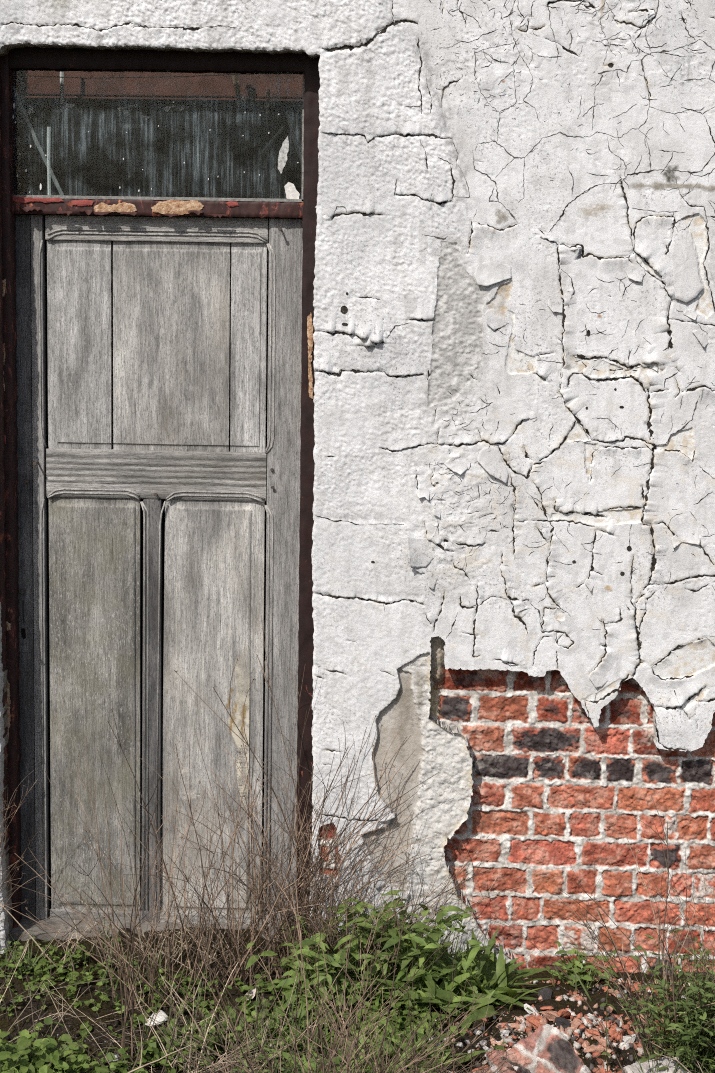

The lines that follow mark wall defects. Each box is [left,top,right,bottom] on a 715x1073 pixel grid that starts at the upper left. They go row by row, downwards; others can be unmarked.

crack [3,22,237,42]
crack [315,0,715,751]
flaking render [318,636,715,976]